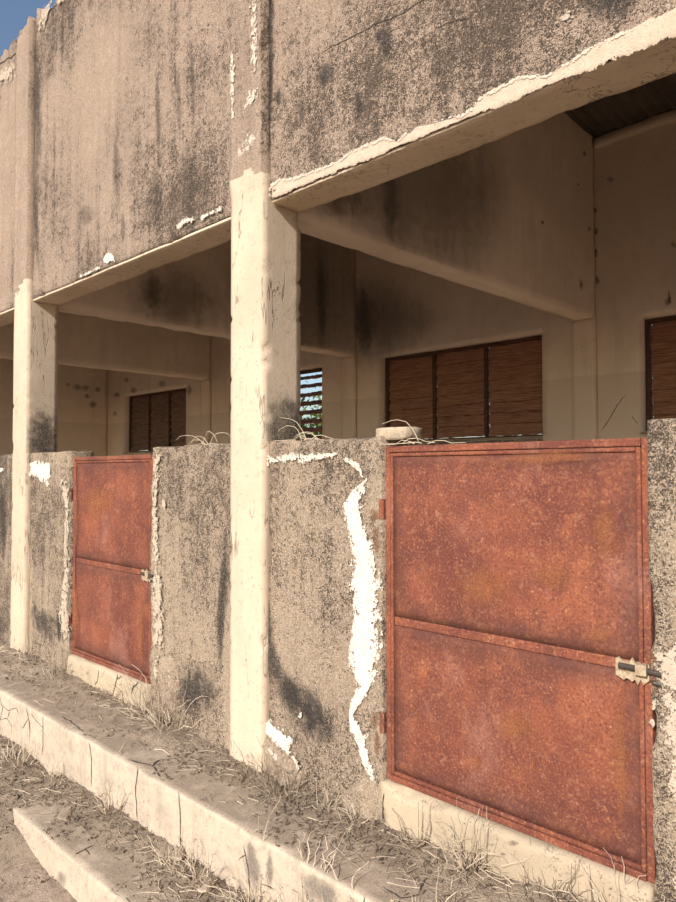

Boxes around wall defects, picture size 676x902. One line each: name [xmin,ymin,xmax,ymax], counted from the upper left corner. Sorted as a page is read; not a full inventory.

water stain [268,0,280,119]
crack [317,0,422,56]
peeling [269,8,676,198]
peeling [29,458,71,647]
water stain [268,603,332,737]
peeling [266,451,383,781]
peeling [649,643,676,800]